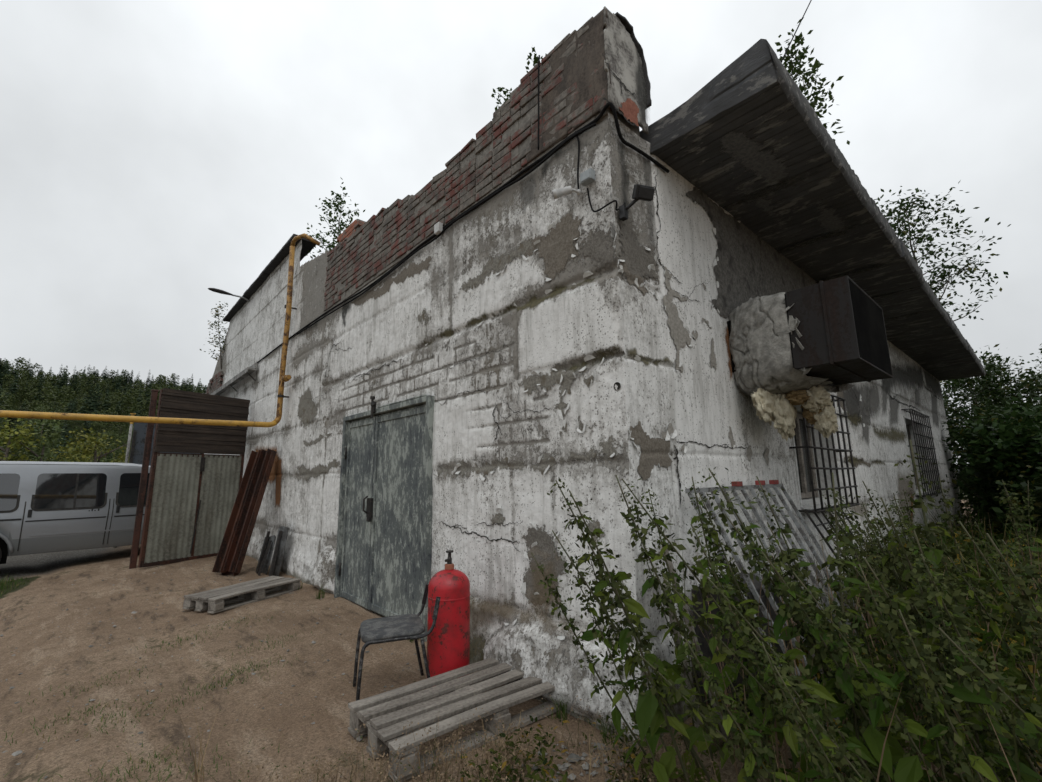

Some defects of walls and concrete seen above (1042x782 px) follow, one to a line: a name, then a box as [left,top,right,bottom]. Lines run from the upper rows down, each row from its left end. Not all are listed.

crack [655,171,702,302]
peeling [453,187,817,372]
peeling [297,386,342,447]
spalling [628,421,688,480]
crack [664,439,757,508]
crack [441,521,520,552]
flaking render [521,523,566,608]